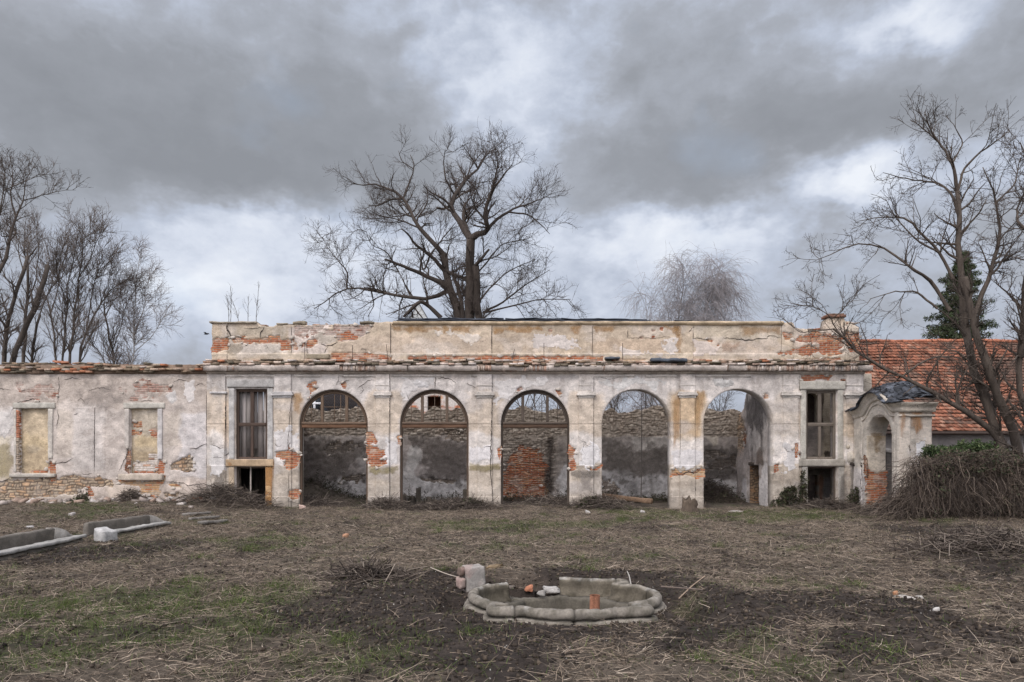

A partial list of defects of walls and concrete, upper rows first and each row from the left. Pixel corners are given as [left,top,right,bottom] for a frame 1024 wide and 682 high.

spalling [211,322,392,361]
crack [627,326,782,348]
spalling [777,332,861,360]
spalling [119,378,196,404]
spalling [0,382,196,500]
peeling [273,425,303,470]
spalling [326,432,403,485]
peeling [669,428,747,479]
spalling [861,453,888,507]